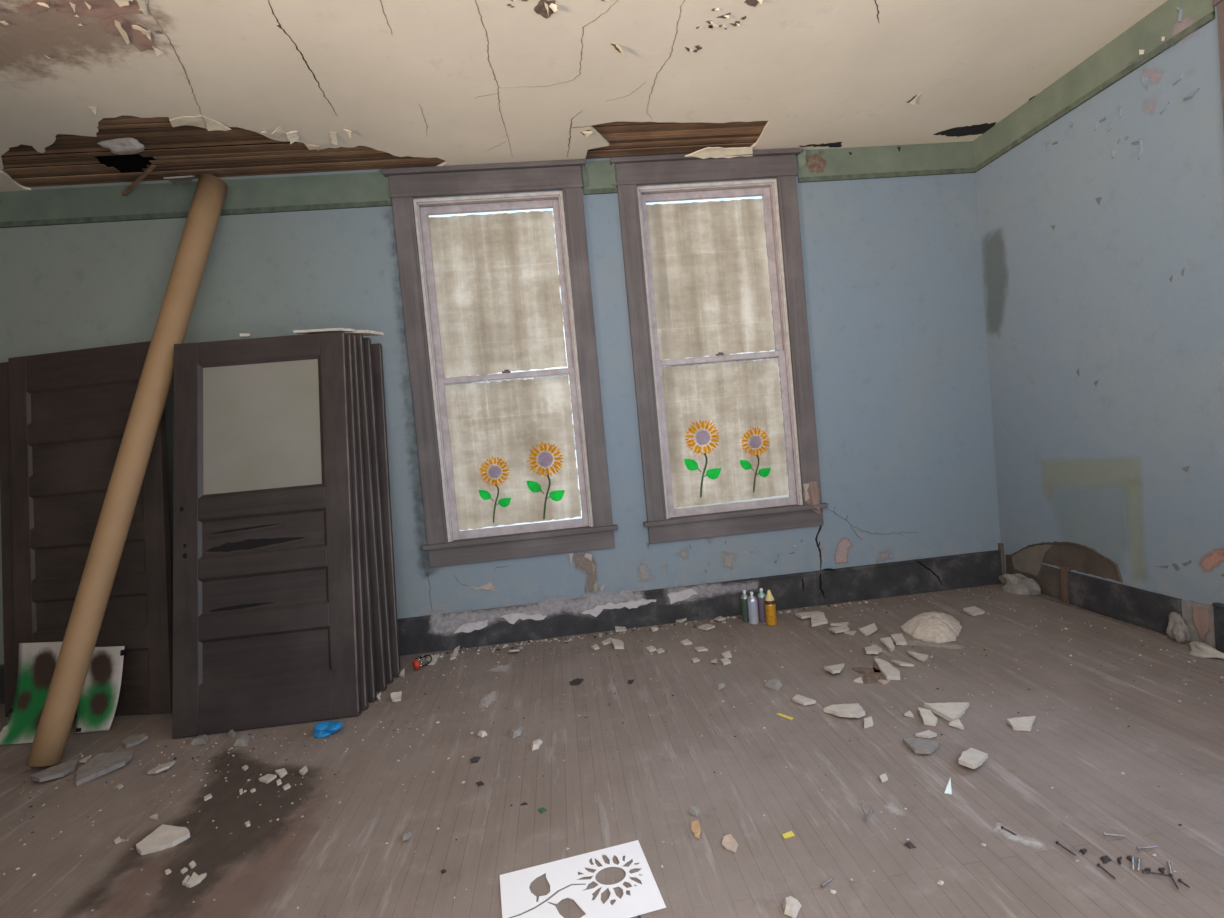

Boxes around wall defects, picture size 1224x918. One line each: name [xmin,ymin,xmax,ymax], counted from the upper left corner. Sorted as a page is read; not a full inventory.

peeling [0,0,163,72]
crack [147,0,202,115]
crack [268,0,336,113]
peeling [507,0,557,19]
crack [475,0,618,152]
crack [567,0,685,158]
peeling [696,0,763,30]
flaking render [1,107,445,196]
flaking render [580,121,768,159]
crack [802,508,942,598]
spalling [999,541,1123,604]
water stain [155,752,314,918]